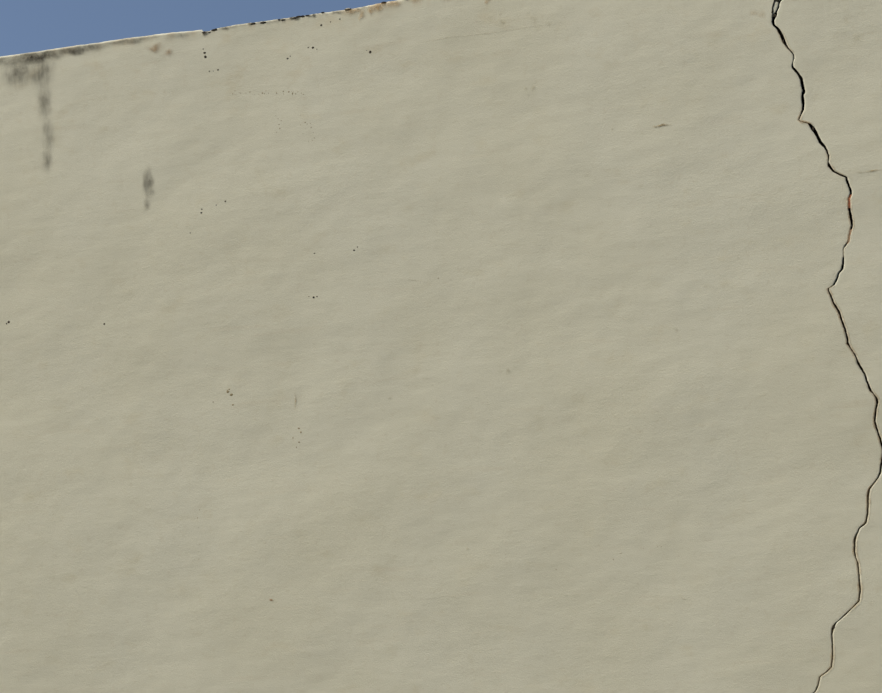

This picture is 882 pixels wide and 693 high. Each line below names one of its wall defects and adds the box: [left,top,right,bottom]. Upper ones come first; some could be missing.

crack [771,0,882,693]